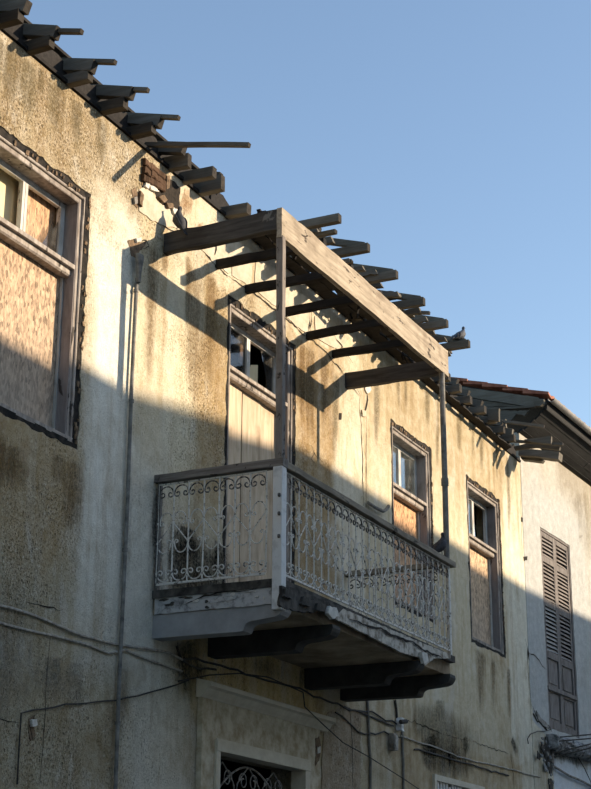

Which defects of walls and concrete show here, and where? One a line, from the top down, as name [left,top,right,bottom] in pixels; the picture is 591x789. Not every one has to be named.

flaking render [132,158,181,229]
leakage [148,251,167,352]